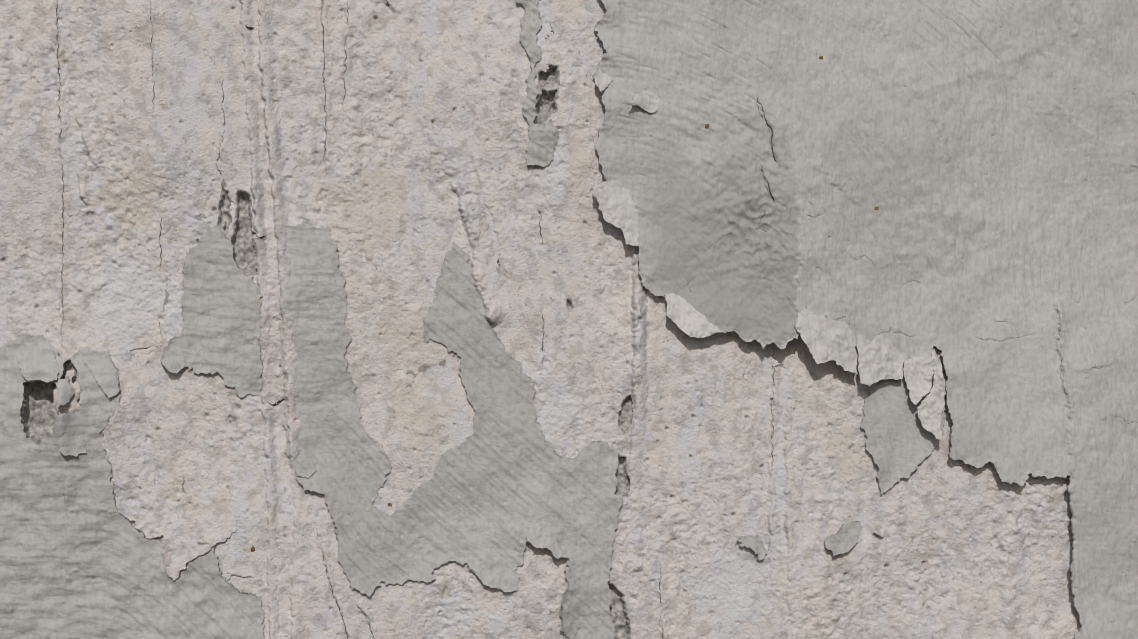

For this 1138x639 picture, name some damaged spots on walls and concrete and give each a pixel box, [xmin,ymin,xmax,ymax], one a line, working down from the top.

crack [320,0,349,178]
peeling [516,0,560,167]
crack [59,175,67,333]
peeling [160,180,263,398]
peeling [592,0,1138,639]
peeling [0,332,265,639]
peeling [278,221,634,639]